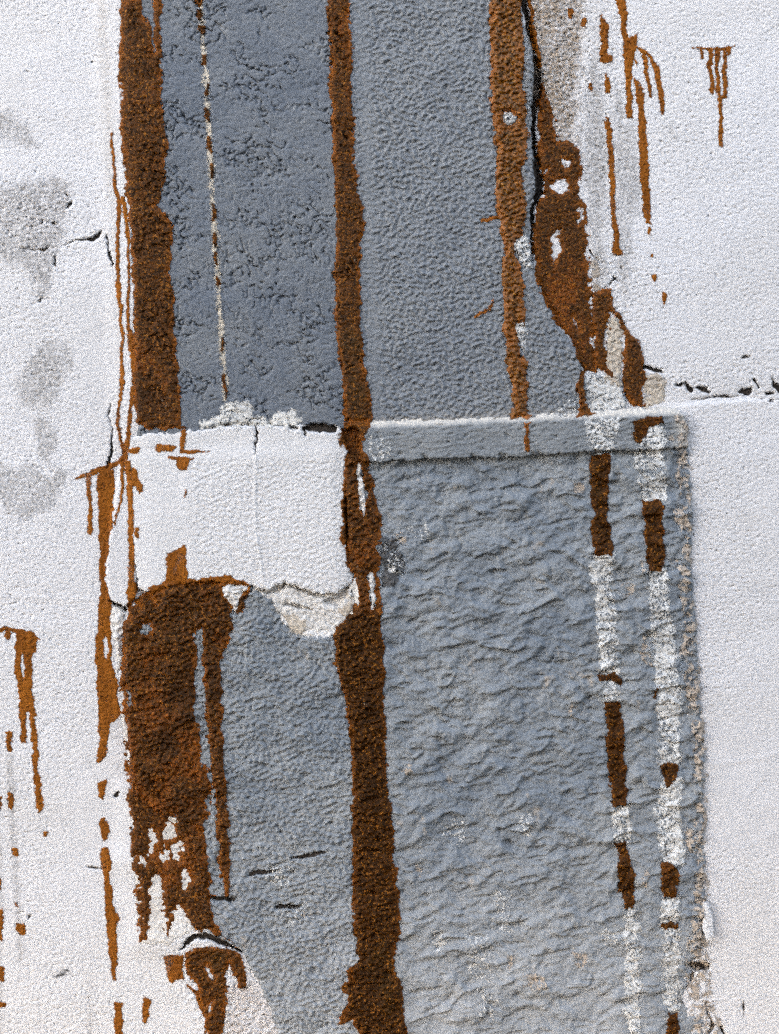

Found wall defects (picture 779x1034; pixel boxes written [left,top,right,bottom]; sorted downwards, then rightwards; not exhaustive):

corrosion [691,45,735,147]
corrosion [474,0,665,452]
corrosion [75,0,251,1034]
spalling [356,463,366,513]
corrosion [326,0,408,1034]
peeling [368,437,390,462]
spalling [110,605,125,673]
spalling [222,531,406,640]
corrosion [0,626,44,813]
spalling [120,704,130,765]
corrosion [603,702,629,807]
peeling [588,414,724,1034]